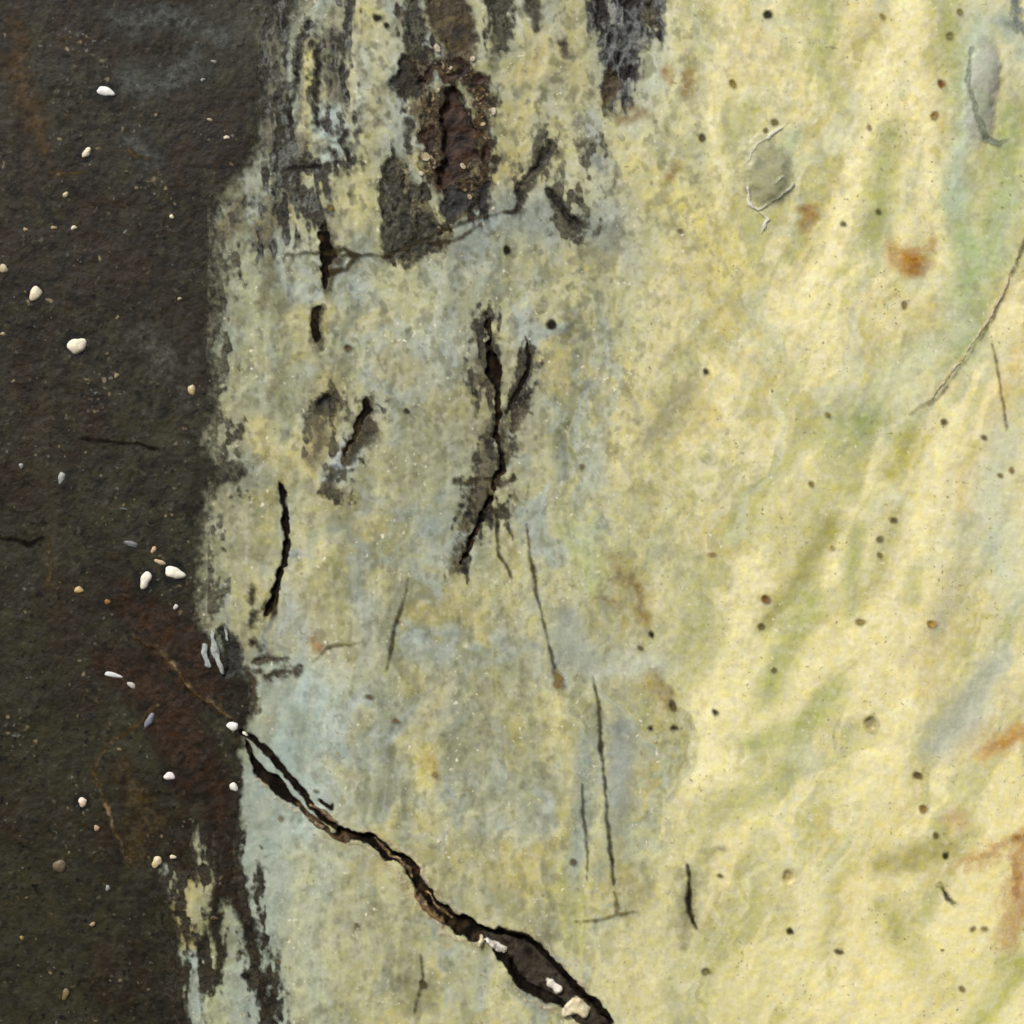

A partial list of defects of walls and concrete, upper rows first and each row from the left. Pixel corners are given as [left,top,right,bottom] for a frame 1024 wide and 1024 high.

spalling [373,0,517,269]
peeling [585,0,666,116]
corrosion [894,249,925,274]
crack [912,243,1024,420]
leakage [0,0,298,1024]
crack [451,302,563,688]
crack [132,634,613,1024]
crack [581,685,633,922]